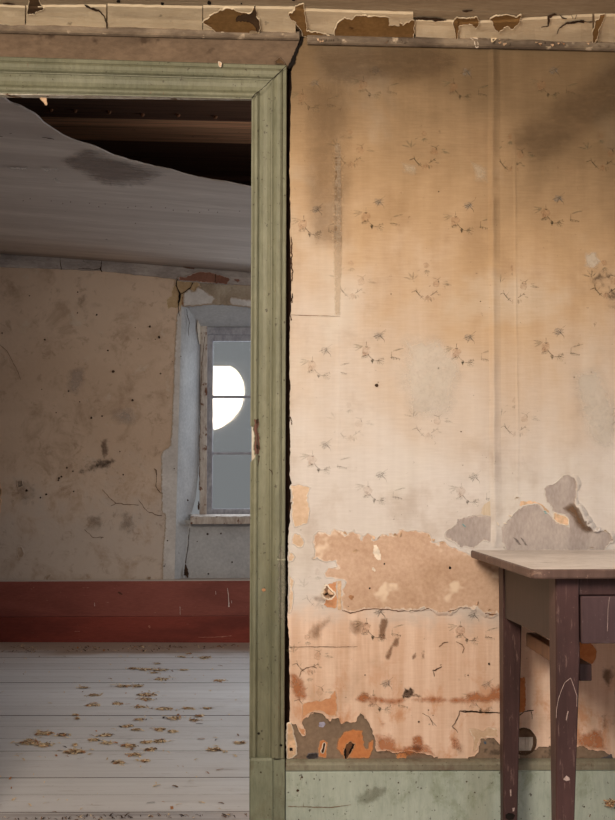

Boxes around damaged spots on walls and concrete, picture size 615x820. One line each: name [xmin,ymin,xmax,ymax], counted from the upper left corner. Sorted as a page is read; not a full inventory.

peeling [167,271,239,309]
spalling [321,584,336,600]
spalling [286,712,439,759]
spalling [467,737,500,759]